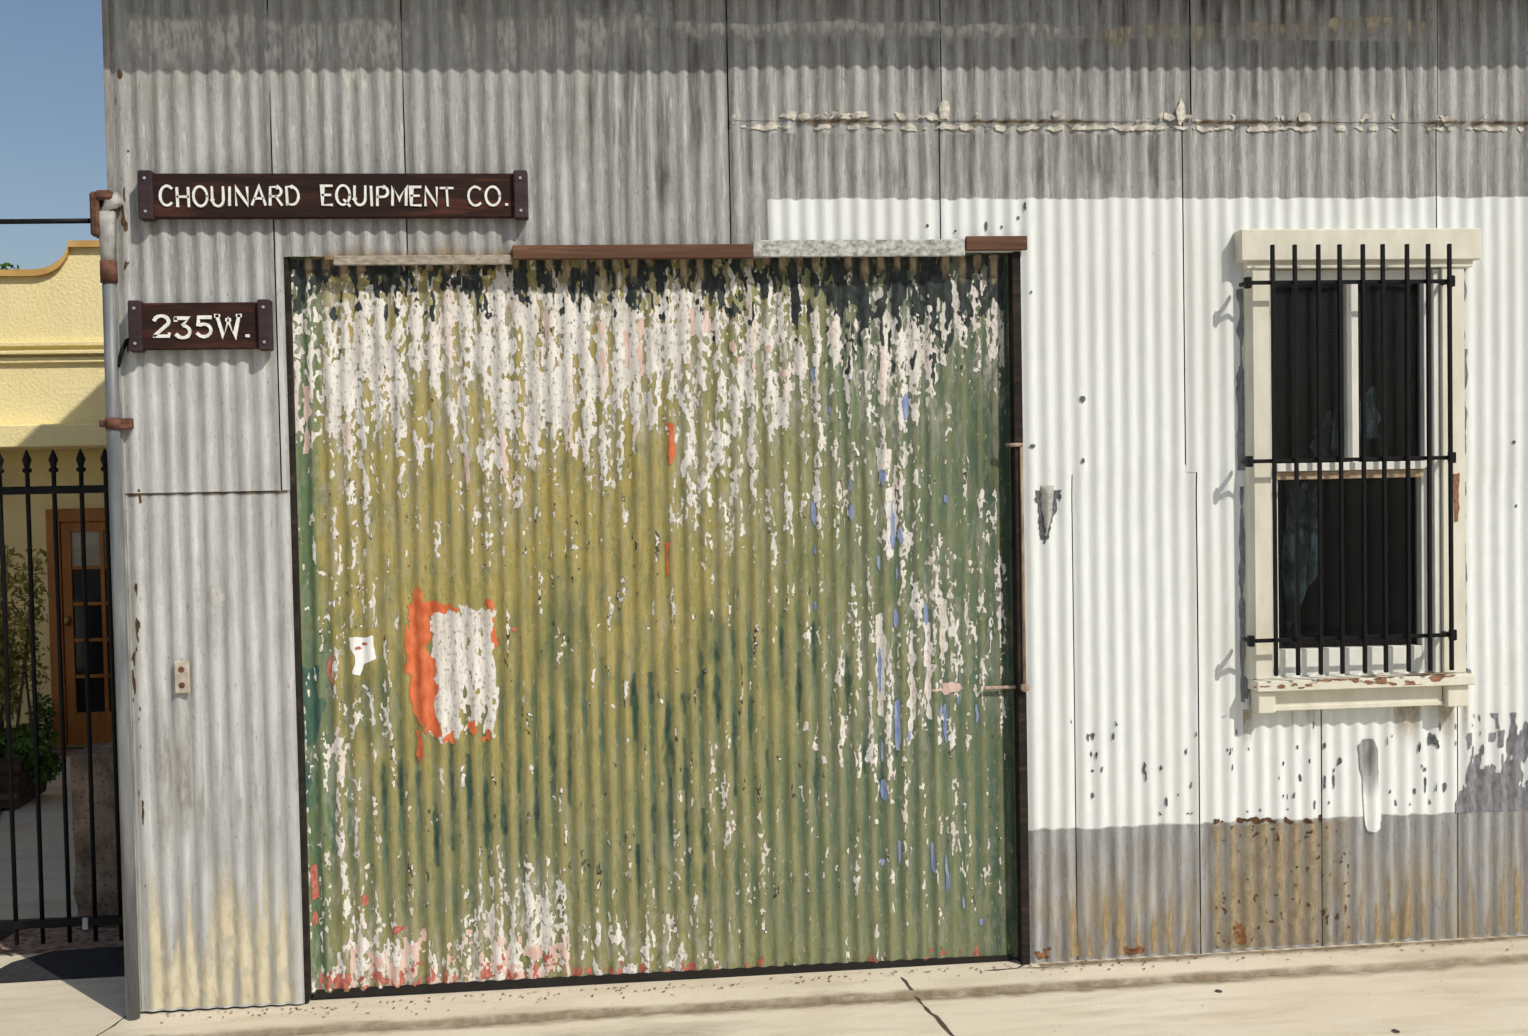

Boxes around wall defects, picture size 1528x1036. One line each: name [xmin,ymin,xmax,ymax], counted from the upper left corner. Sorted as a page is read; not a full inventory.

water stain [124,10,416,93]
water stain [445,10,654,77]
water stain [675,18,1077,42]
peeling [291,256,1007,992]
peeling [1390,712,1528,813]
corrosion [1213,815,1427,949]